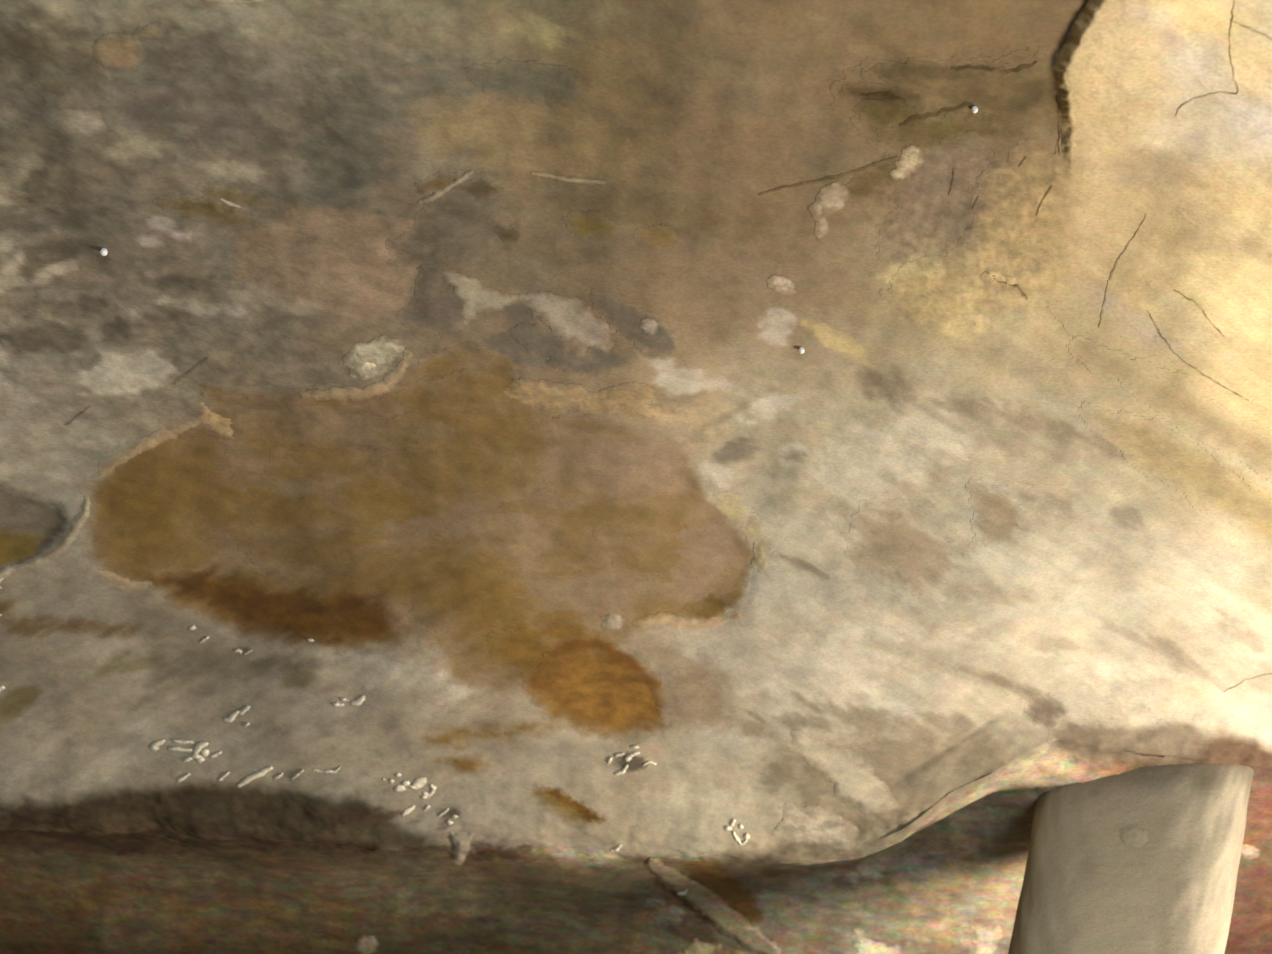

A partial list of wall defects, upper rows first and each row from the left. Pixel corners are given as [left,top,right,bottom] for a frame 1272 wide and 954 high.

damp [465,58,590,108]
crack [861,92,973,126]
crack [951,0,1088,155]
crack [1175,0,1272,116]
damp [531,171,606,185]
damp [828,45,1090,331]
damp [385,172,526,339]
damp [508,289,680,380]
crack [1148,311,1249,401]
crack [1174,290,1225,338]
damp [0,525,51,569]
spalling [675,853,773,931]